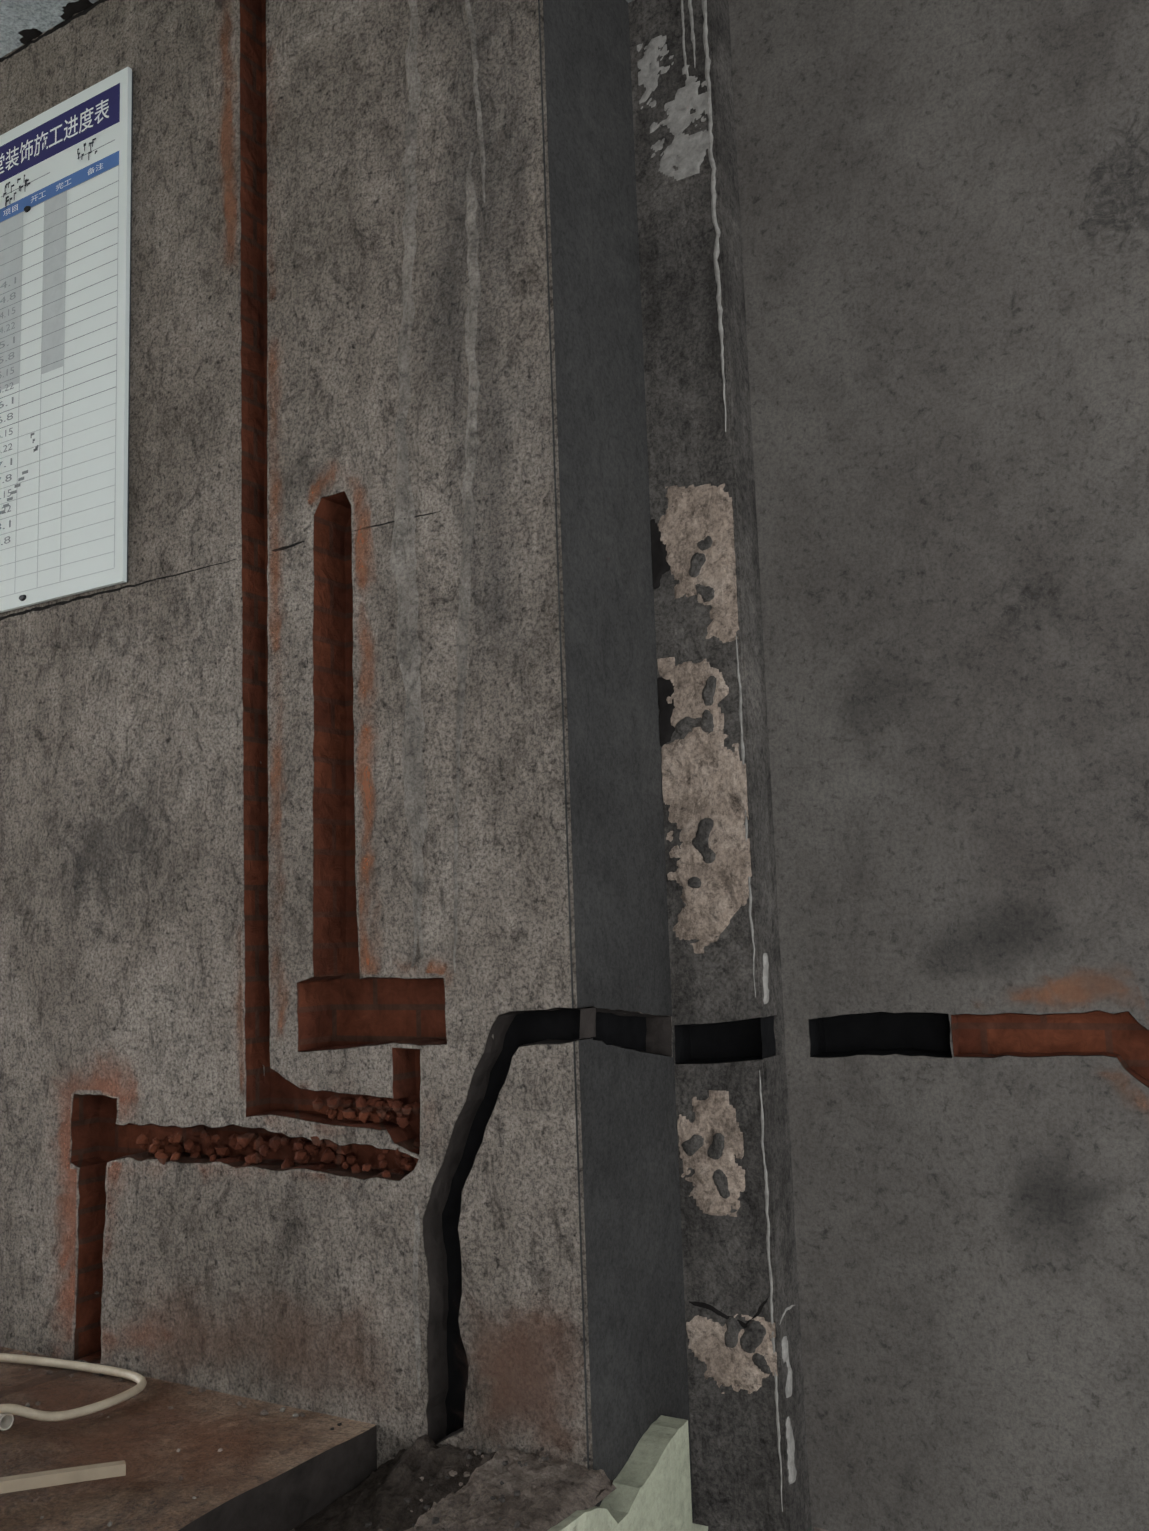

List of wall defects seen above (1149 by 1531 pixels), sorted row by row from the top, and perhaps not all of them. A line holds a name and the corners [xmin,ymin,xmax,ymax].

peeling [637,35,709,181]
peeling [650,484,739,643]
peeling [657,657,752,953]
peeling [677,1090,745,1217]
crack [689,1297,794,1328]